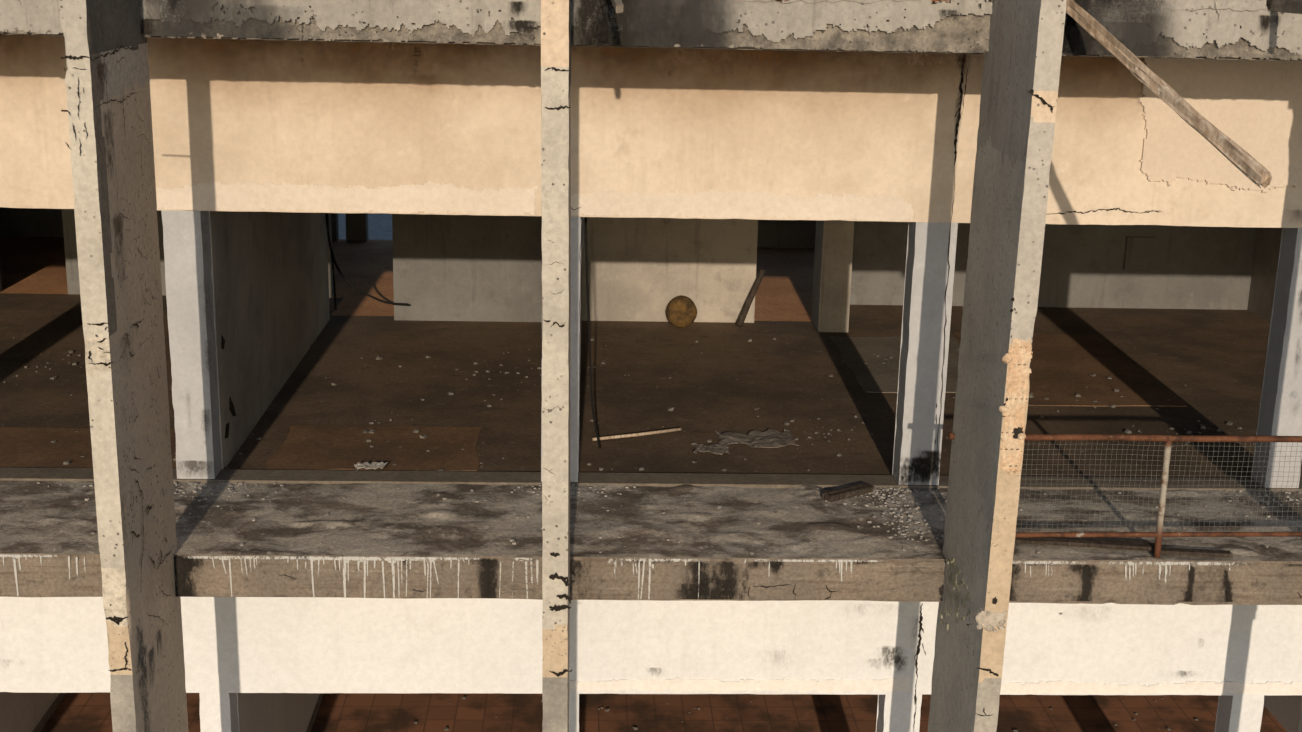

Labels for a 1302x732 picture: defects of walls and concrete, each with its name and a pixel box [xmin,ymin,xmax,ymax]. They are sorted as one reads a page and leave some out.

leakage [141,0,260,38]
spalling [571,22,623,46]
spalling [649,0,992,54]
crack [1009,1,1055,111]
crack [1054,207,1159,215]
crack [935,61,985,485]
spalling [999,338,1033,475]
leakage [0,554,85,596]
leakage [174,556,539,599]
leakage [608,558,877,599]
leakage [1009,561,1243,602]
crack [914,603,926,724]